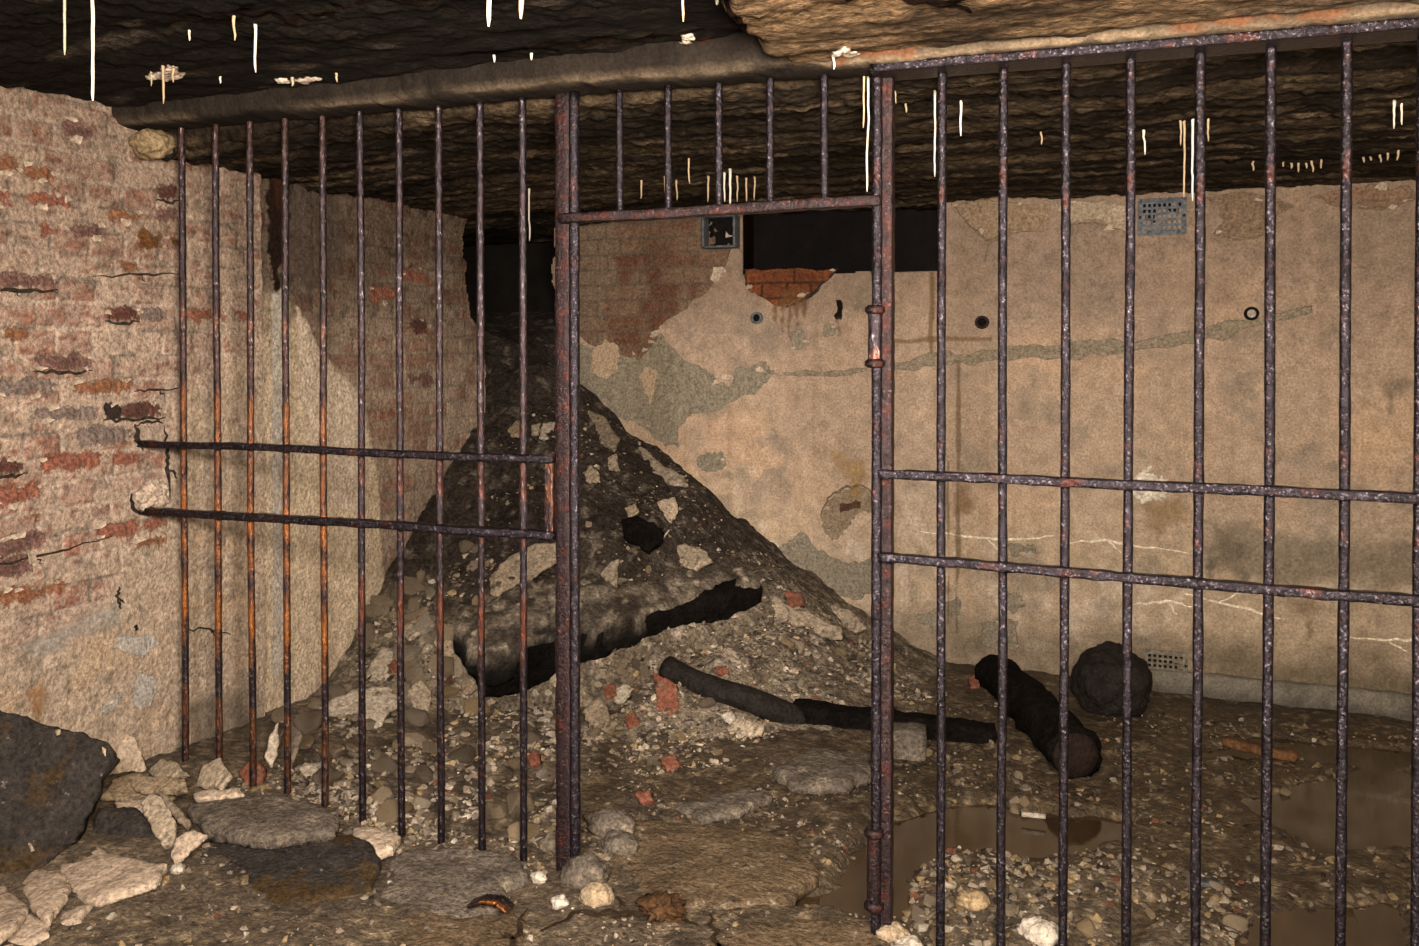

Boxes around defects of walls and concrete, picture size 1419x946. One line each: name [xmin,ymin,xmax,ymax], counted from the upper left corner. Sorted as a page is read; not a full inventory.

leakage [679,34,695,45]
leakage [145,65,185,82]
leakage [275,77,322,85]
flaking render [744,268,838,308]
flaking render [579,217,774,447]